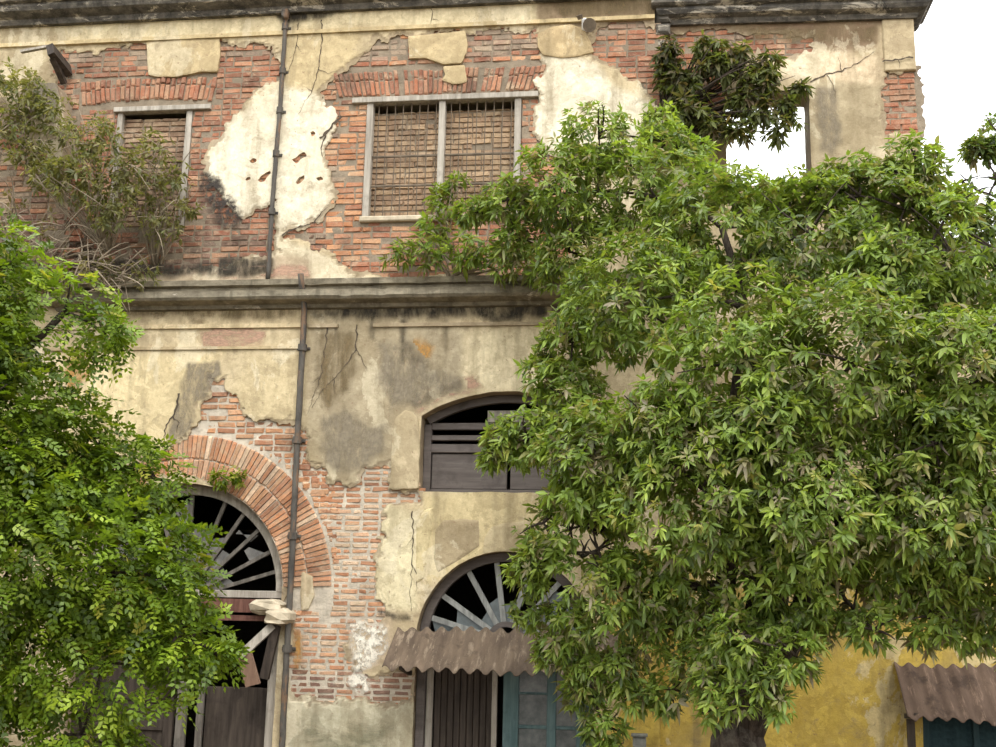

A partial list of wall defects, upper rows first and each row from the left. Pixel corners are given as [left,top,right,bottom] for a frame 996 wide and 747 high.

crack [810,53,913,93]
flaking render [881,65,926,138]
flaking render [53,27,574,277]
crack [307,325,365,414]
damp [315,306,561,405]
damp [323,413,383,469]
flaking render [159,374,426,704]